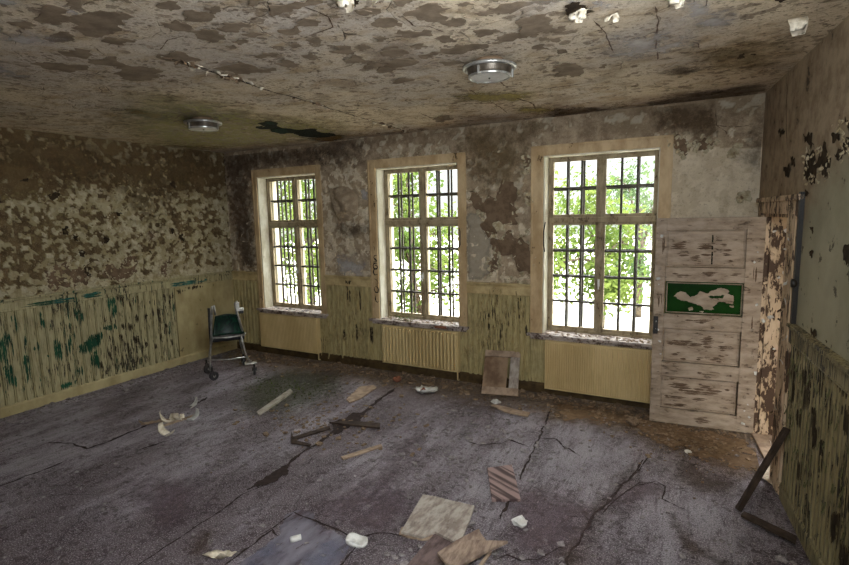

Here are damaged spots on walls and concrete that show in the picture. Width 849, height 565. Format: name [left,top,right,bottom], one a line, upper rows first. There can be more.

peeling [6,0,163,81]
crack [305,6,336,37]
peeling [156,0,592,84]
spalling [787,16,809,37]
crack [160,36,407,133]
peeling [667,132,720,160]
spalling [783,118,849,197]
spalling [0,168,207,389]
peeling [460,128,536,379]
crack [470,409,580,480]
crack [495,454,683,565]